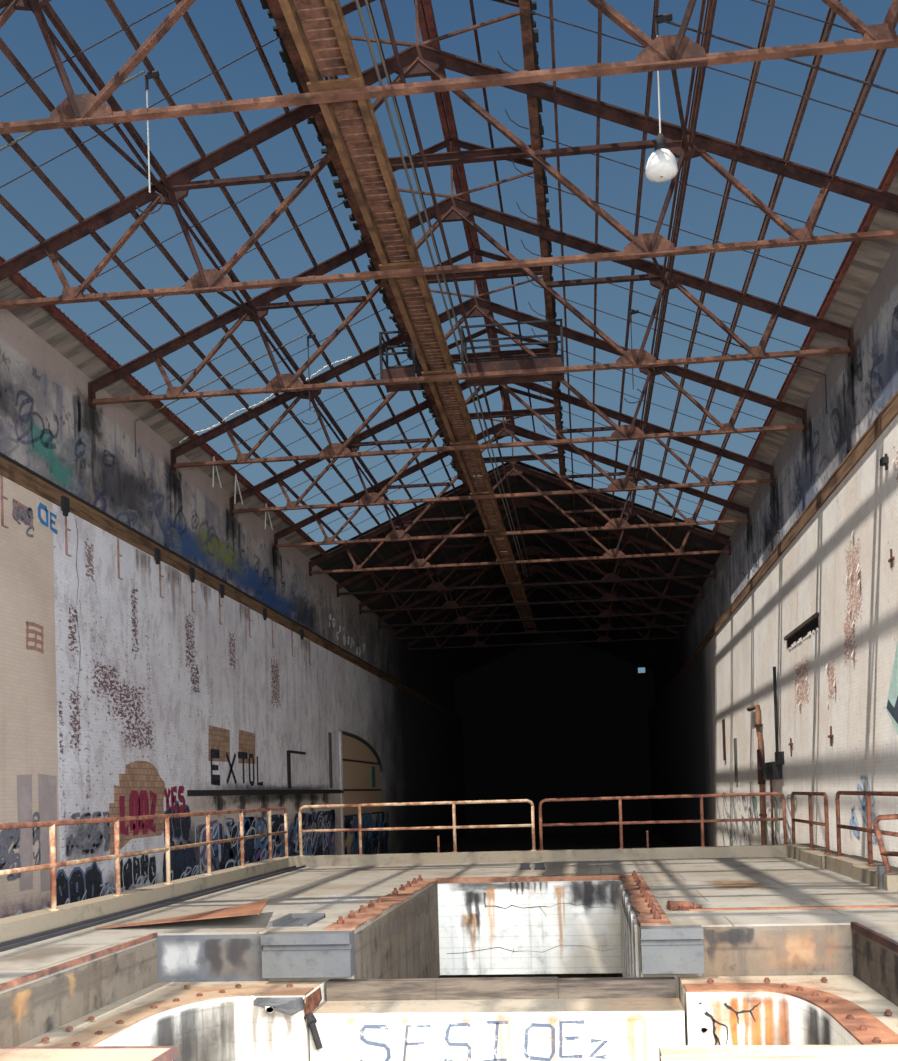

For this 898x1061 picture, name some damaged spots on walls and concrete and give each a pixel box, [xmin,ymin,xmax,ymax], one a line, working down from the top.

peeling [67,598,80,657]
peeling [826,526,865,706]
peeling [58,655,156,759]
damp [467,892,486,926]
crack [485,903,614,916]
rust [730,998,788,1045]